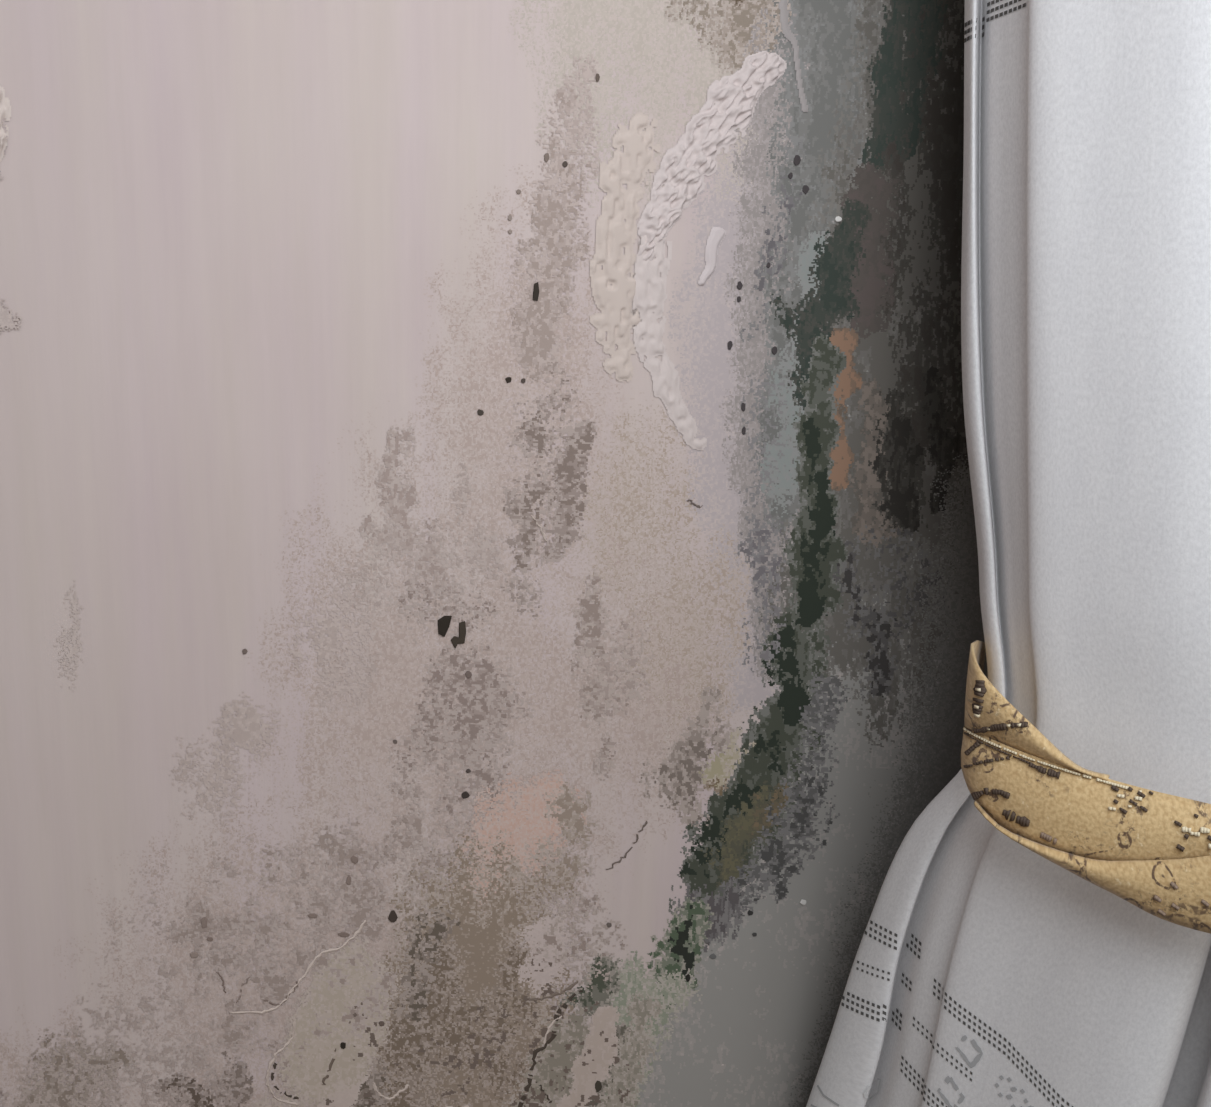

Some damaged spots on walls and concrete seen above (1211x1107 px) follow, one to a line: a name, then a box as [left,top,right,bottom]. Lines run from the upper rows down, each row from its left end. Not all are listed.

crack [518,981,583,1107]